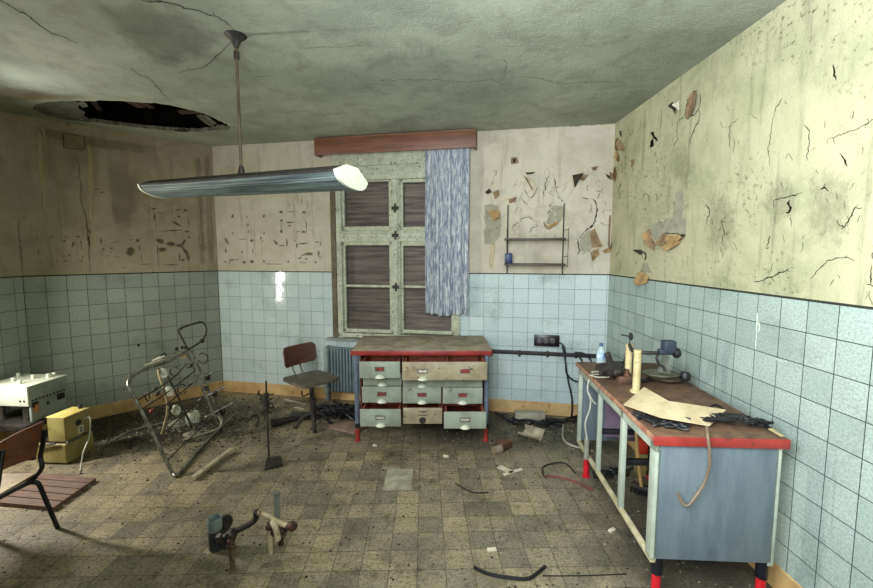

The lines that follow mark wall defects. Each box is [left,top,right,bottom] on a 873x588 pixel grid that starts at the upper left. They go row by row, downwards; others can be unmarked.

crack [142,0,233,72]
flaking render [32,106,230,132]
peeling [613,130,634,167]
peeling [668,90,701,120]
crack [76,157,91,249]
peeling [479,157,621,269]
peeling [633,192,686,285]
crack [721,100,873,282]
crack [813,252,873,305]